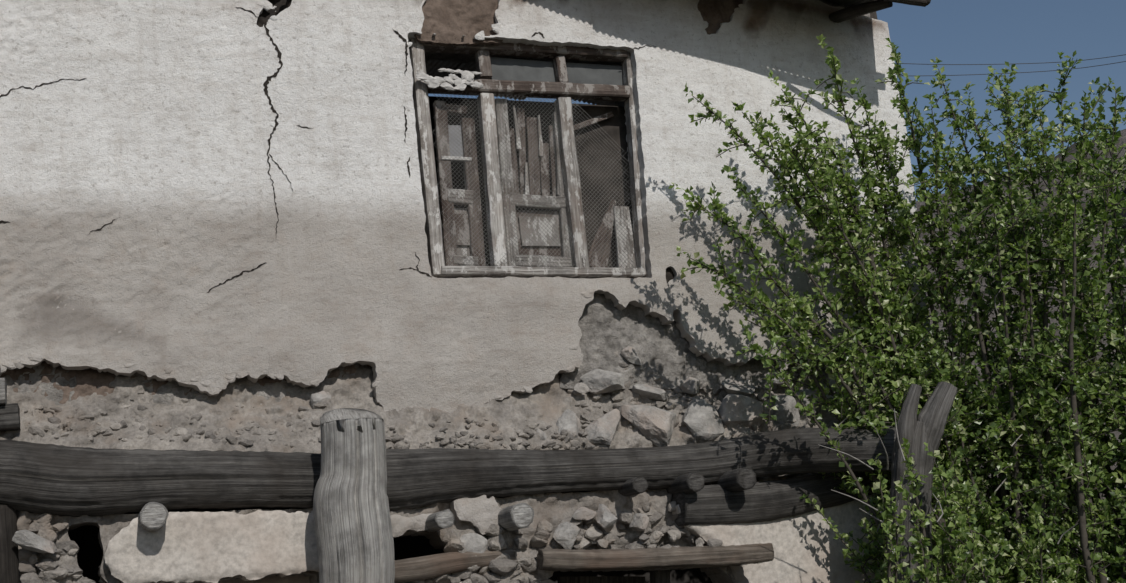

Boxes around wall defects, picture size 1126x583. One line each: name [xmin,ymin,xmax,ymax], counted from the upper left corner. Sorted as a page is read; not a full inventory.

spalling [414,0,503,47]
spalling [697,0,747,35]
crack [236,0,313,233]
crack [207,262,267,293]
spalling [559,288,790,394]
spalling [0,353,172,404]
spalling [225,370,287,386]
spalling [309,364,371,386]
spalling [494,386,533,399]